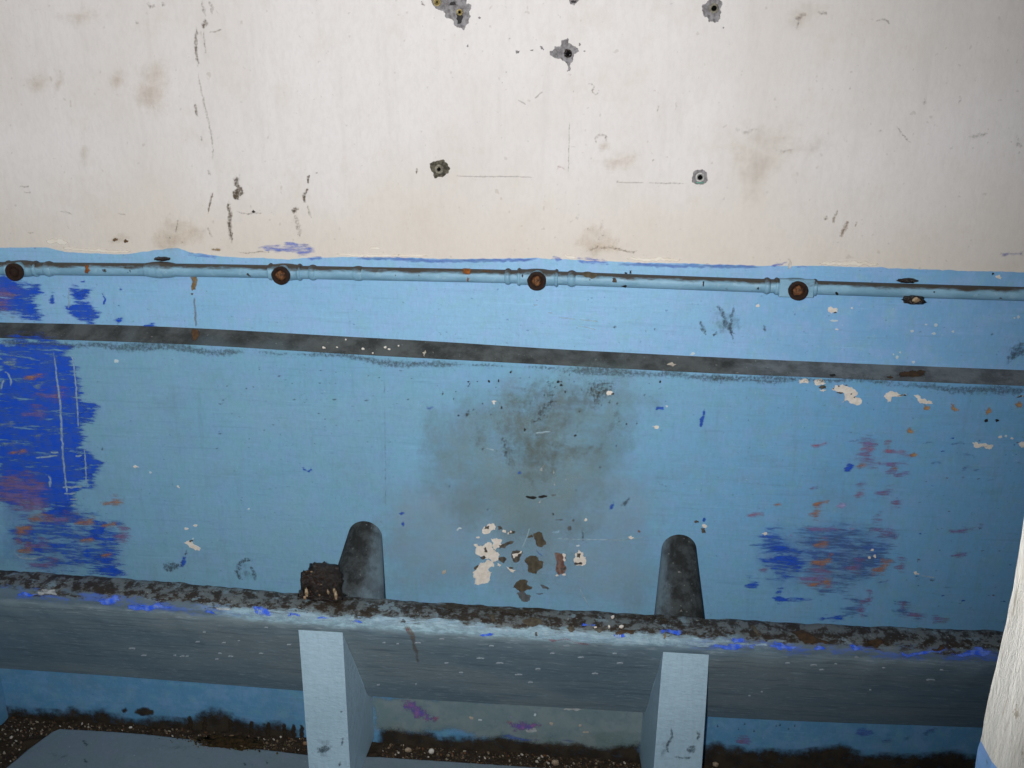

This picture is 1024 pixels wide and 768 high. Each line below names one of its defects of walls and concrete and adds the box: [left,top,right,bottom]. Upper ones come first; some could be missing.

spalling [422,0,481,30]
spalling [702,0,724,28]
spalling [516,38,585,72]
spalling [430,159,450,178]
peeling [0,276,54,321]
peeling [66,281,106,324]
peeling [799,378,862,405]
peeling [884,391,933,410]
peeling [0,335,129,578]
peeling [754,501,903,602]
peeling [253,523,828,664]
peeling [957,647,991,657]